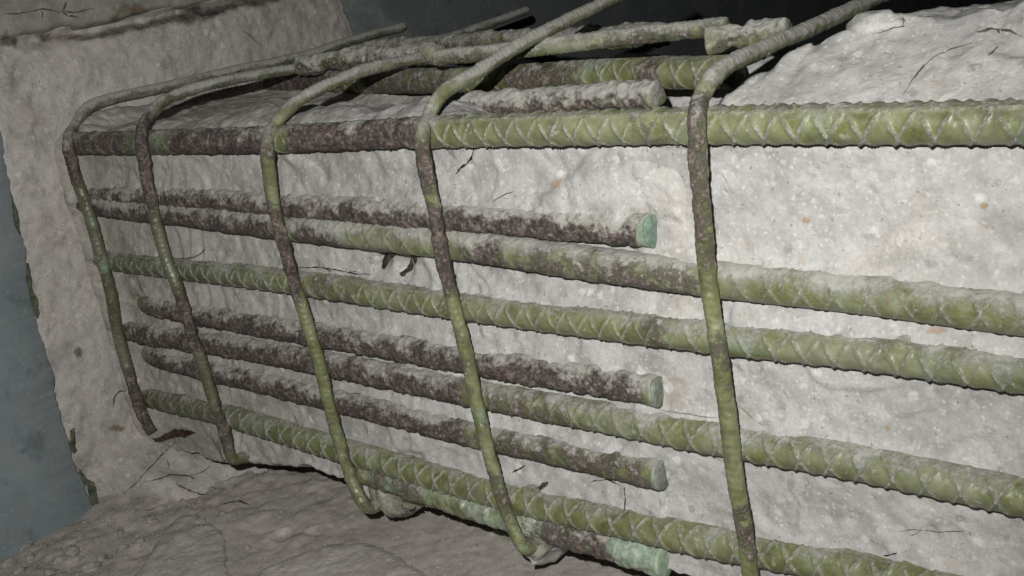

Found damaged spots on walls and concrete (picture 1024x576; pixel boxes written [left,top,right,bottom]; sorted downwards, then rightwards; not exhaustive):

spalling [846,9,904,36]
crack [903,27,1021,94]
spalling [365,253,397,269]
spalling [399,255,417,276]
peeling [69,428,77,454]
peeling [79,469,99,506]
spalling [259,543,423,576]